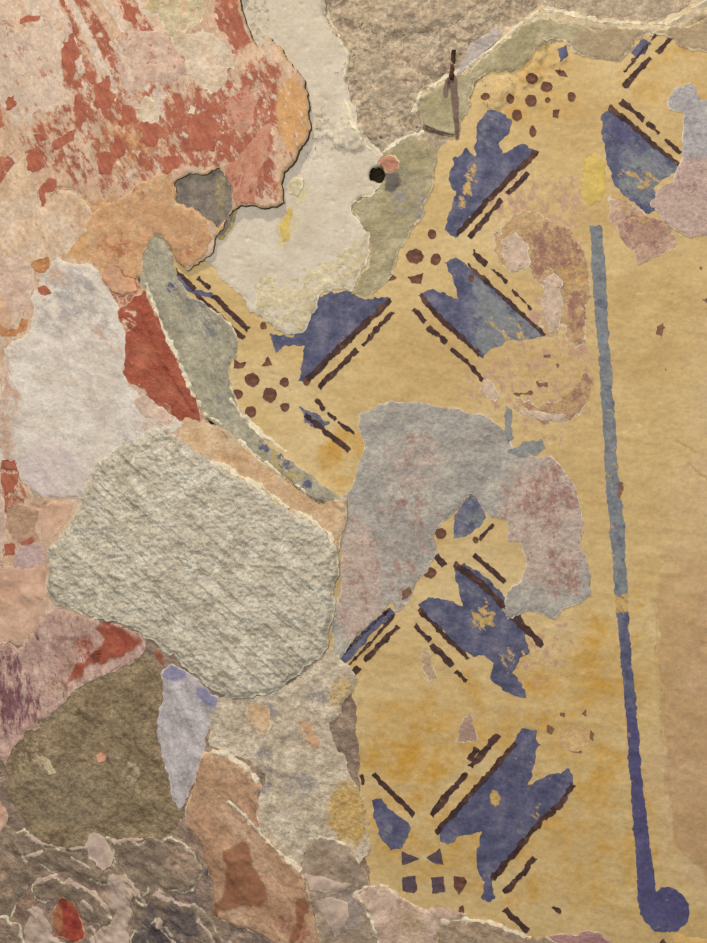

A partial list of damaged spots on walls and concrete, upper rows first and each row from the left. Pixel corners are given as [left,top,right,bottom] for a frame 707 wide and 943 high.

peeling [0,0,390,574]
peeling [480,378,499,402]
peeling [326,0,707,297]
peeling [493,210,592,348]
peeling [513,373,594,425]
peeling [0,400,612,943]